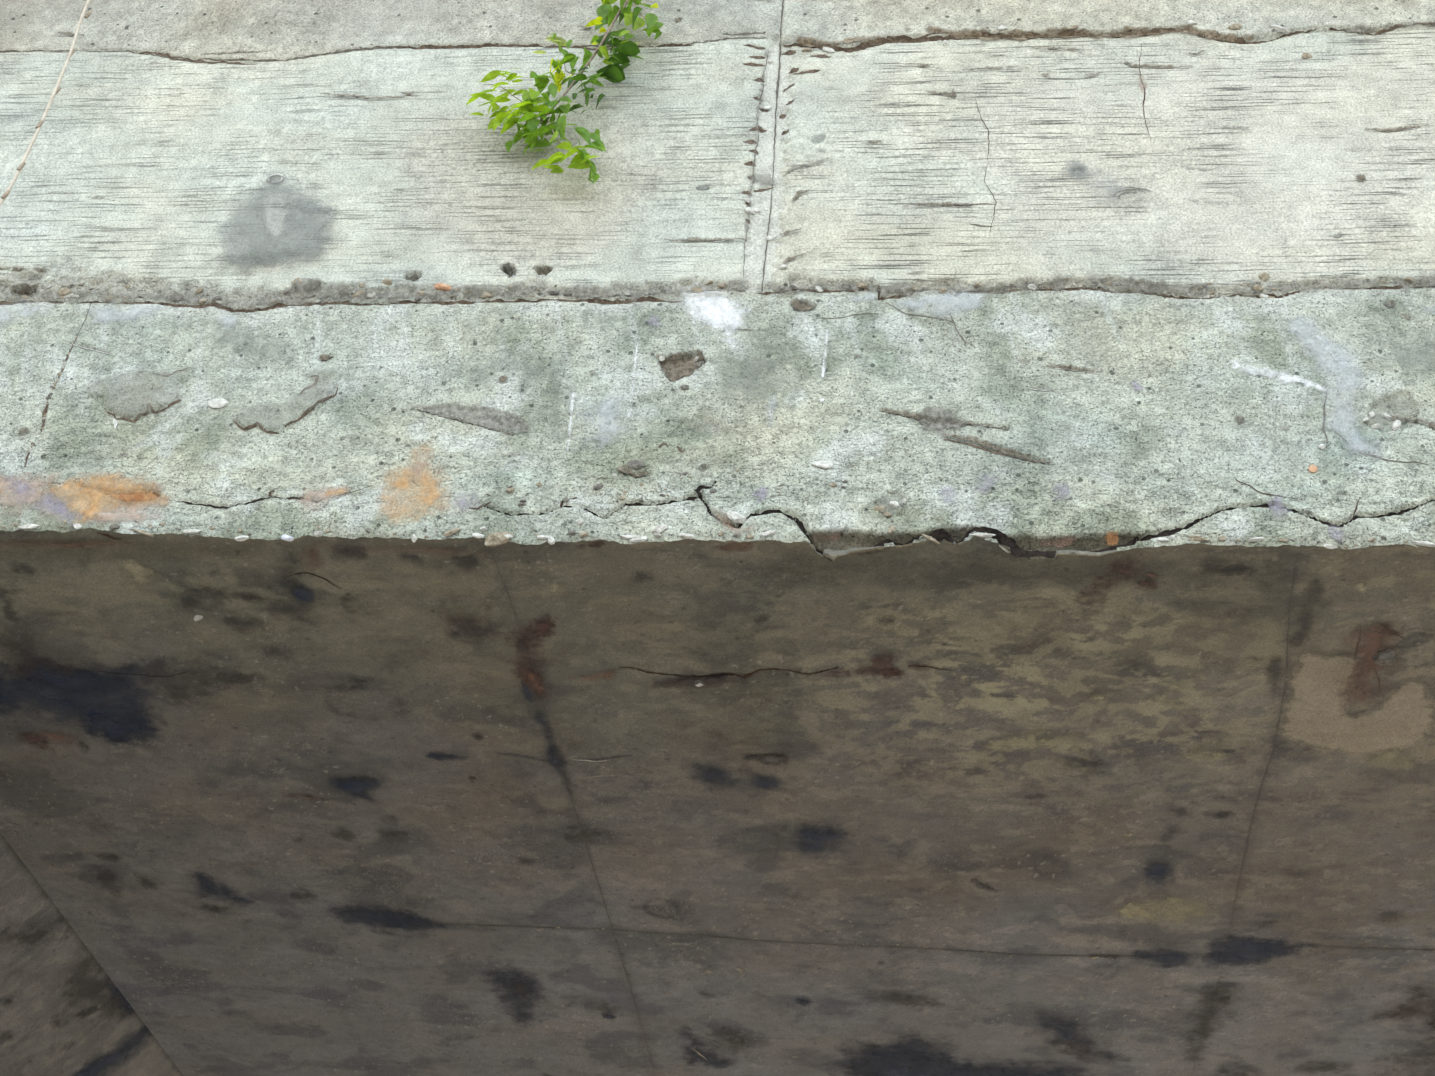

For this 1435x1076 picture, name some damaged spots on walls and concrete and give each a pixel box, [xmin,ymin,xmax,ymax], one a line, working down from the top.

water stain [227,181,331,262]
spalling [656,351,705,390]
crack [1323,390,1429,465]
corrosion [0,474,165,547]
crack [469,481,825,558]
crack [871,479,1435,558]
water stain [0,658,189,742]
corrosion [513,616,555,701]
crack [618,667,839,688]
water stain [337,907,447,934]
water stain [843,1018,1126,1076]